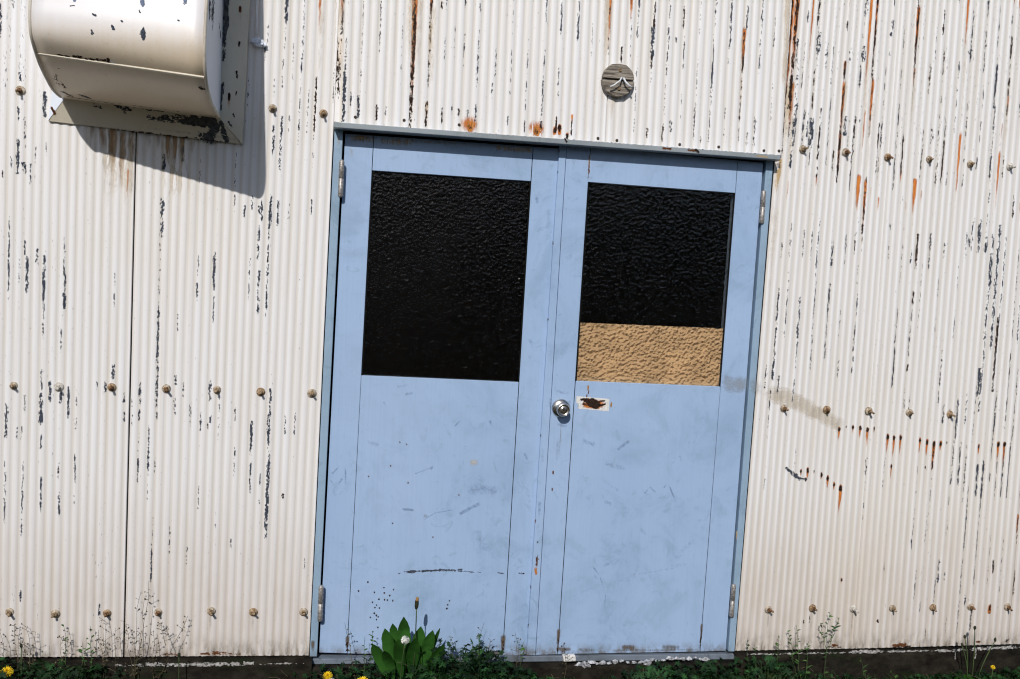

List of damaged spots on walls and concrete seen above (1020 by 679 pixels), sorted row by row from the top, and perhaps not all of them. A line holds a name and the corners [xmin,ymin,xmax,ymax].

corrosion [408,0,418,128]
corrosion [530,115,573,143]
corrosion [775,0,800,186]
corrosion [836,61,846,183]
corrosion [863,0,879,137]
peeling [919,1,1020,185]
peeling [7,216,46,336]
peeling [38,369,77,448]
peeling [122,198,165,483]
peeling [249,388,272,539]
corrosion [919,438,947,470]
peeling [938,193,1018,633]